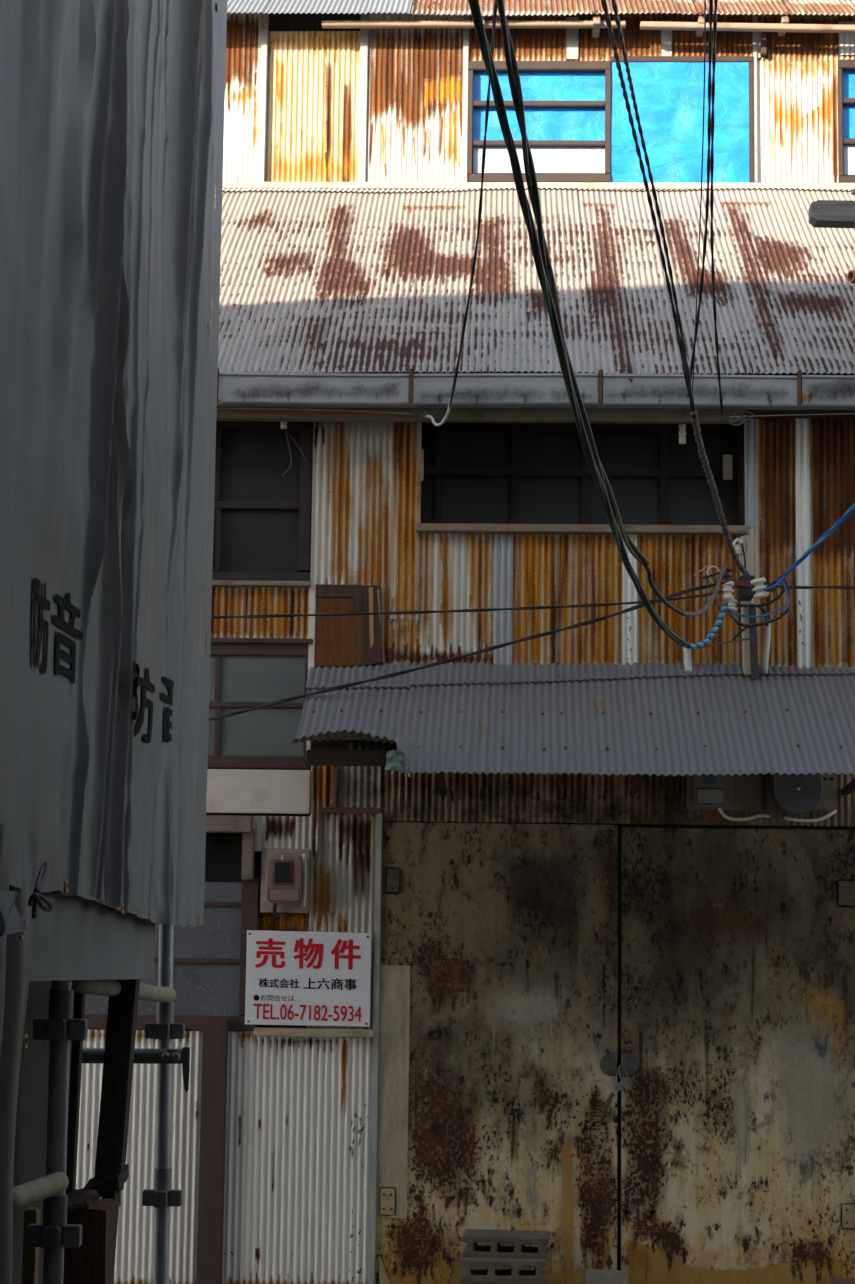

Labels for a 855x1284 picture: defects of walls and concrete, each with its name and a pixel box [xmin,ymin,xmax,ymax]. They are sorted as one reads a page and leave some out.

corrosion [220,0,855,183]
corrosion [237,209,280,233]
corrosion [259,204,560,353]
corrosion [583,203,633,383]
corrosion [664,202,852,360]
corrosion [206,587,308,639]
corrosion [314,422,493,665]
corrosion [512,534,622,666]
corrosion [638,535,743,665]
corrosion [758,418,855,669]
corrosion [258,766,372,933]
corrosion [529,1023,688,1279]